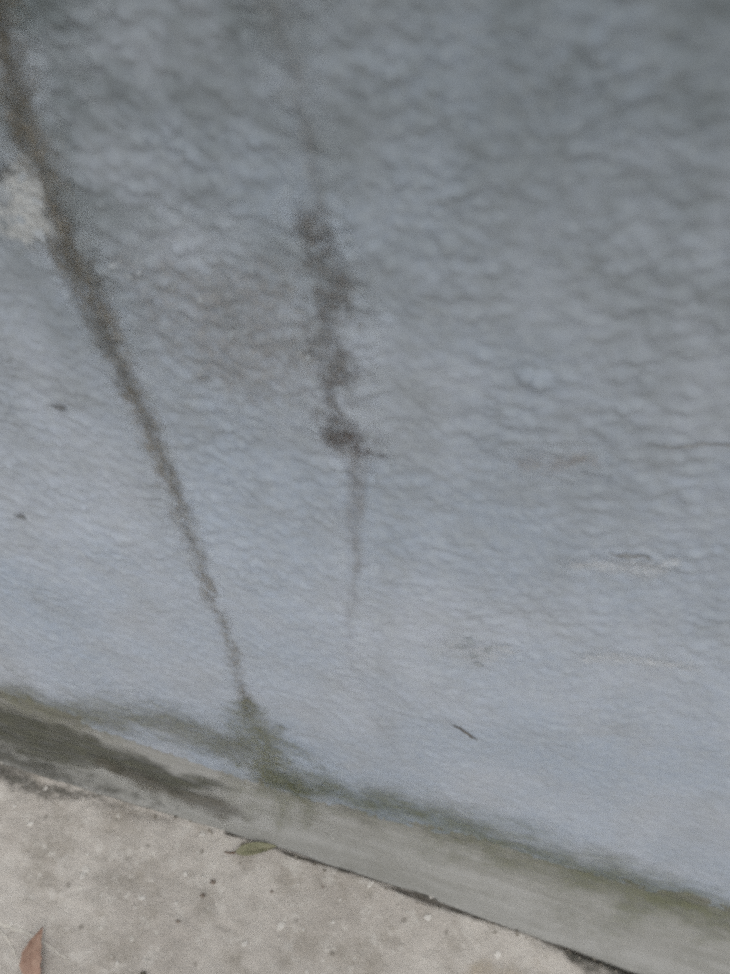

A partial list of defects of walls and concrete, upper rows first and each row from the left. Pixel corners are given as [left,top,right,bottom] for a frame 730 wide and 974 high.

water stain [0,711,226,809]